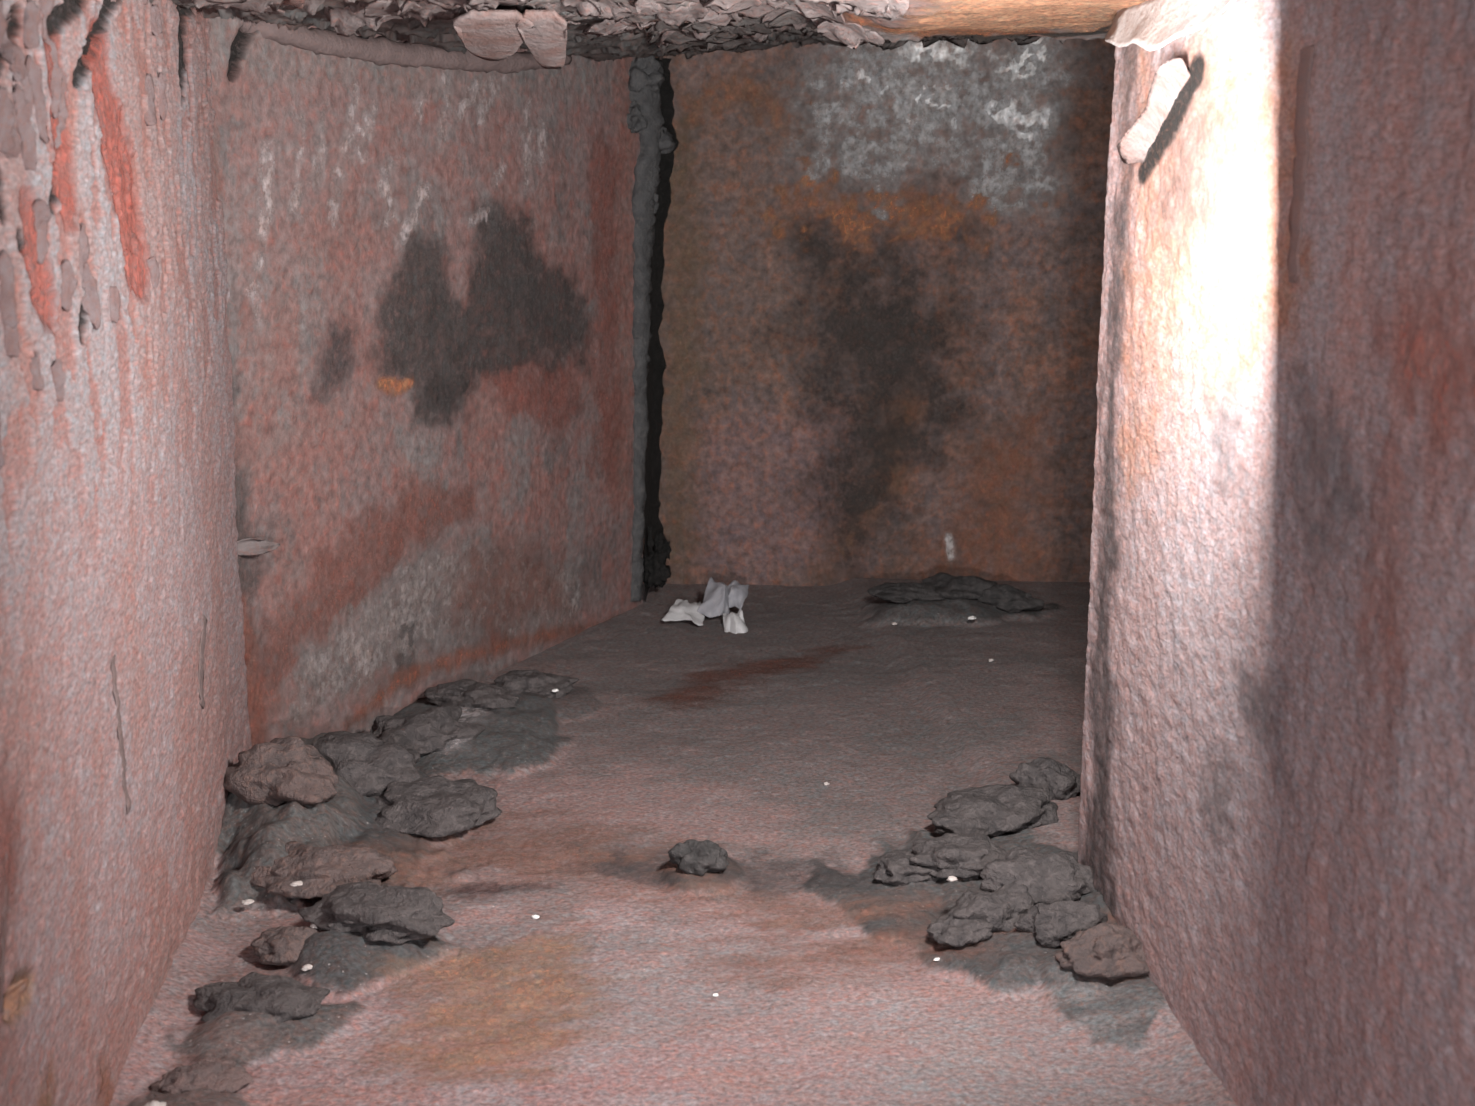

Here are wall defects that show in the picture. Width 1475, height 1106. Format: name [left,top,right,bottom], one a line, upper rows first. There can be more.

peeling [0,250,66,402]
peeling [0,0,69,171]
peeling [32,199,121,330]
leakage [258,83,377,236]
leakage [378,164,430,241]
leakage [469,208,490,225]
peeling [192,0,1041,69]
crack [627,55,679,602]
leakage [807,38,1070,213]
peeling [1105,0,1236,184]
leakage [945,536,953,559]
leakage [1083,164,1130,917]